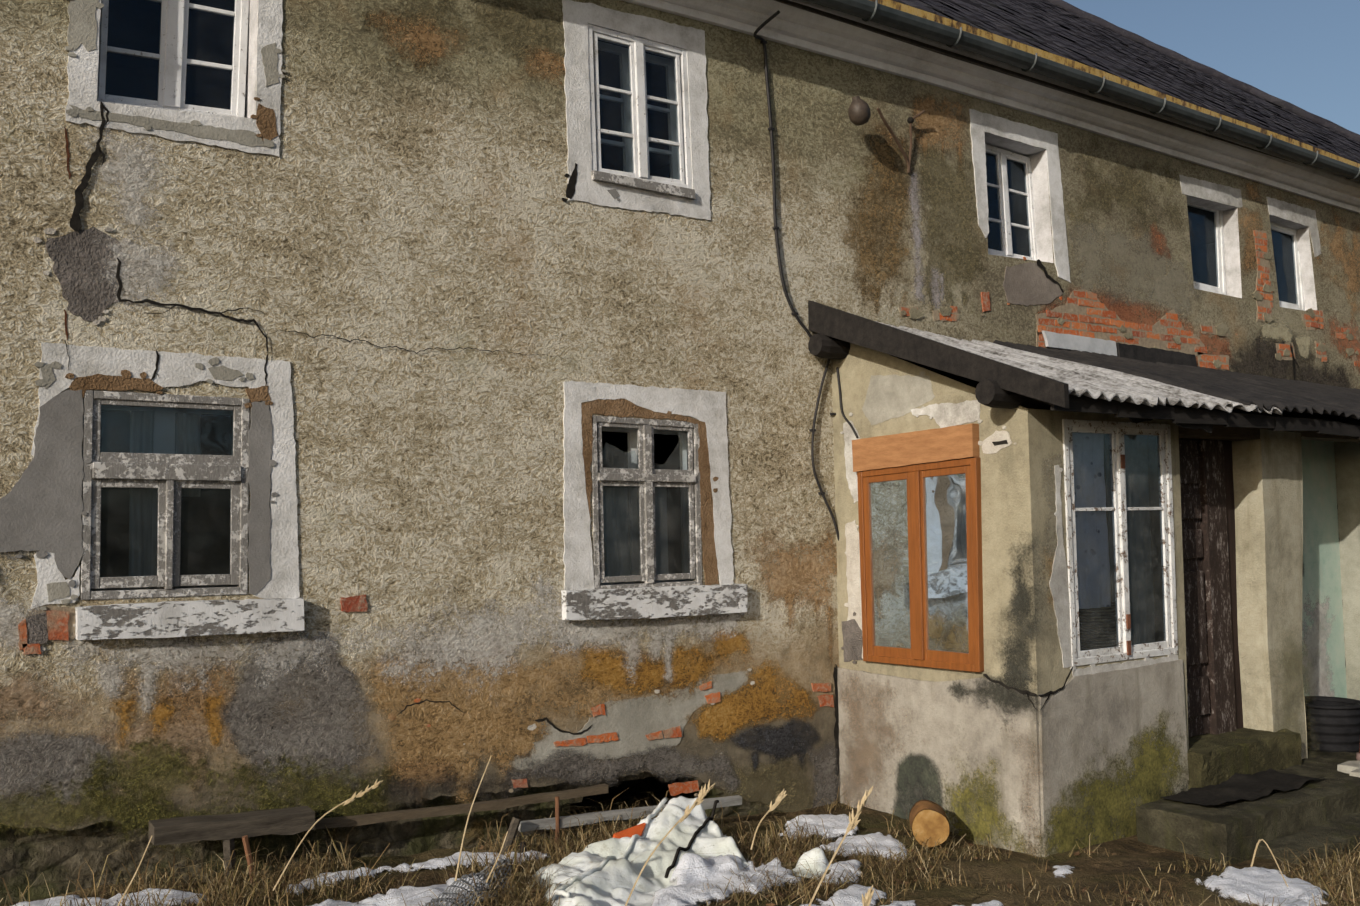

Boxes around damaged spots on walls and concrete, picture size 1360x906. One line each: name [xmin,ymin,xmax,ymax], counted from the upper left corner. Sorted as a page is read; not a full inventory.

crack [63,309,71,370]
flaking render [33,226,131,325]
crack [64,101,109,231]
flaking render [34,361,164,398]
crack [116,257,570,386]
damp [844,126,985,314]
flaking render [981,257,1229,371]
flaking render [1251,230,1360,366]
flaking render [581,399,719,585]
damp [0,599,39,646]
damp [950,539,1040,713]
flaking render [364,630,834,802]